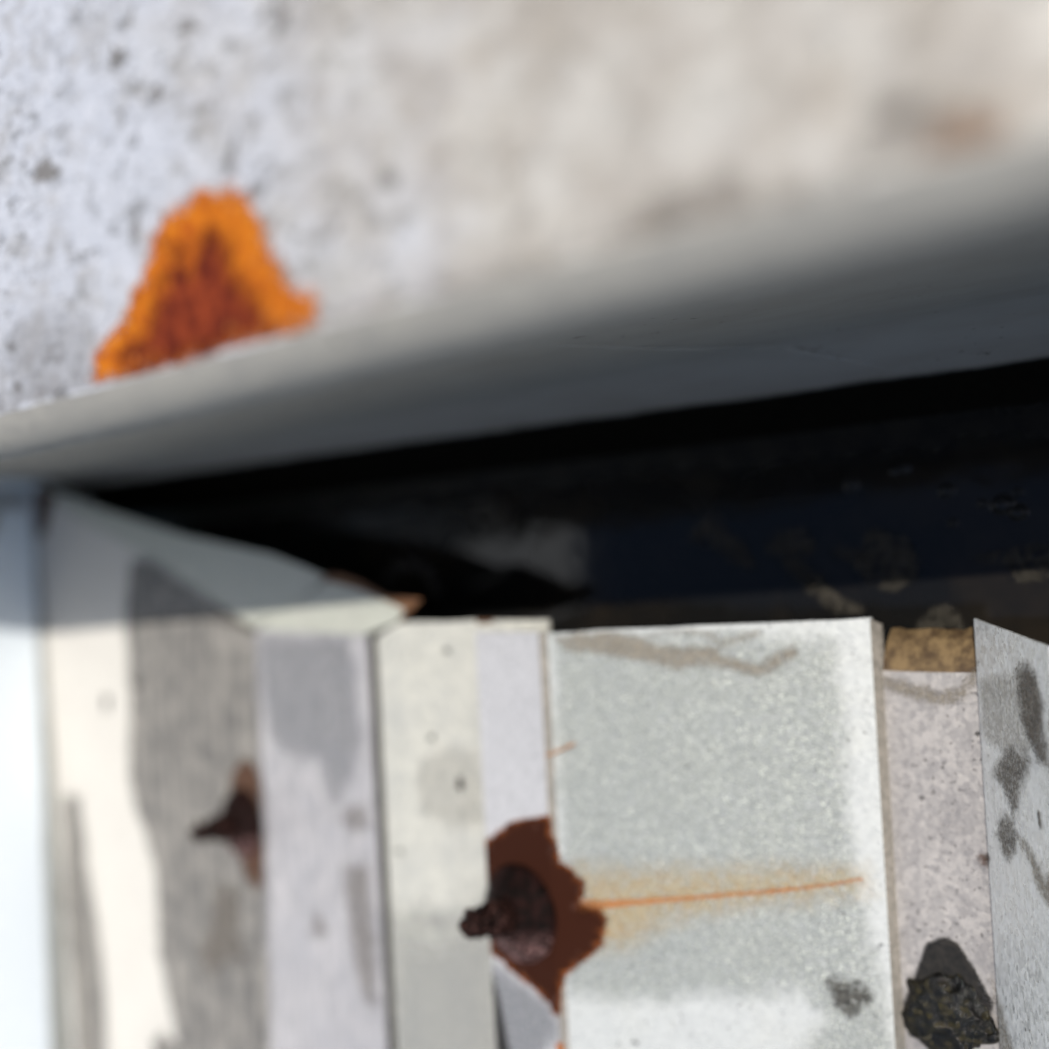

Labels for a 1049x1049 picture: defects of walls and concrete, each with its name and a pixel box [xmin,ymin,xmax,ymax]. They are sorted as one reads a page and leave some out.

corrosion [87,180,320,384]
corrosion [231,758,262,815]
corrosion [241,836,264,892]
corrosion [485,815,863,1016]
leakage [561,637,884,1049]
leakage [994,748,1049,904]